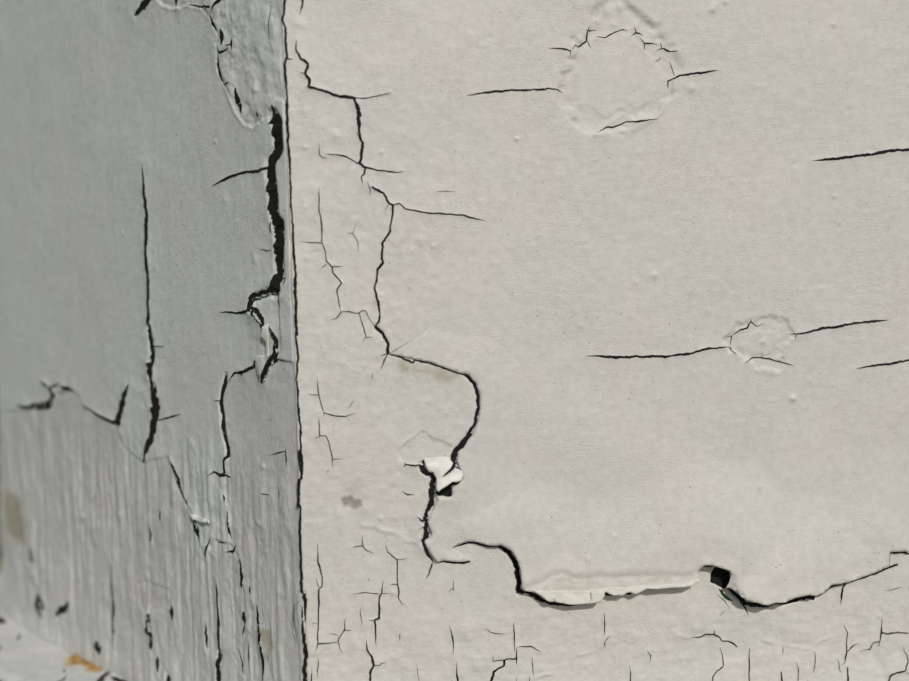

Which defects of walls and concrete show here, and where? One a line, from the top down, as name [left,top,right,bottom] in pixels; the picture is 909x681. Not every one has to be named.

peeling [158,0,284,129]
crack [813,148,909,161]
crack [16,0,574,681]
crack [592,322,791,365]
crack [793,320,887,339]
peeling [0,323,304,681]
peeling [389,330,909,605]
crack [604,589,653,646]
crack [691,551,909,681]